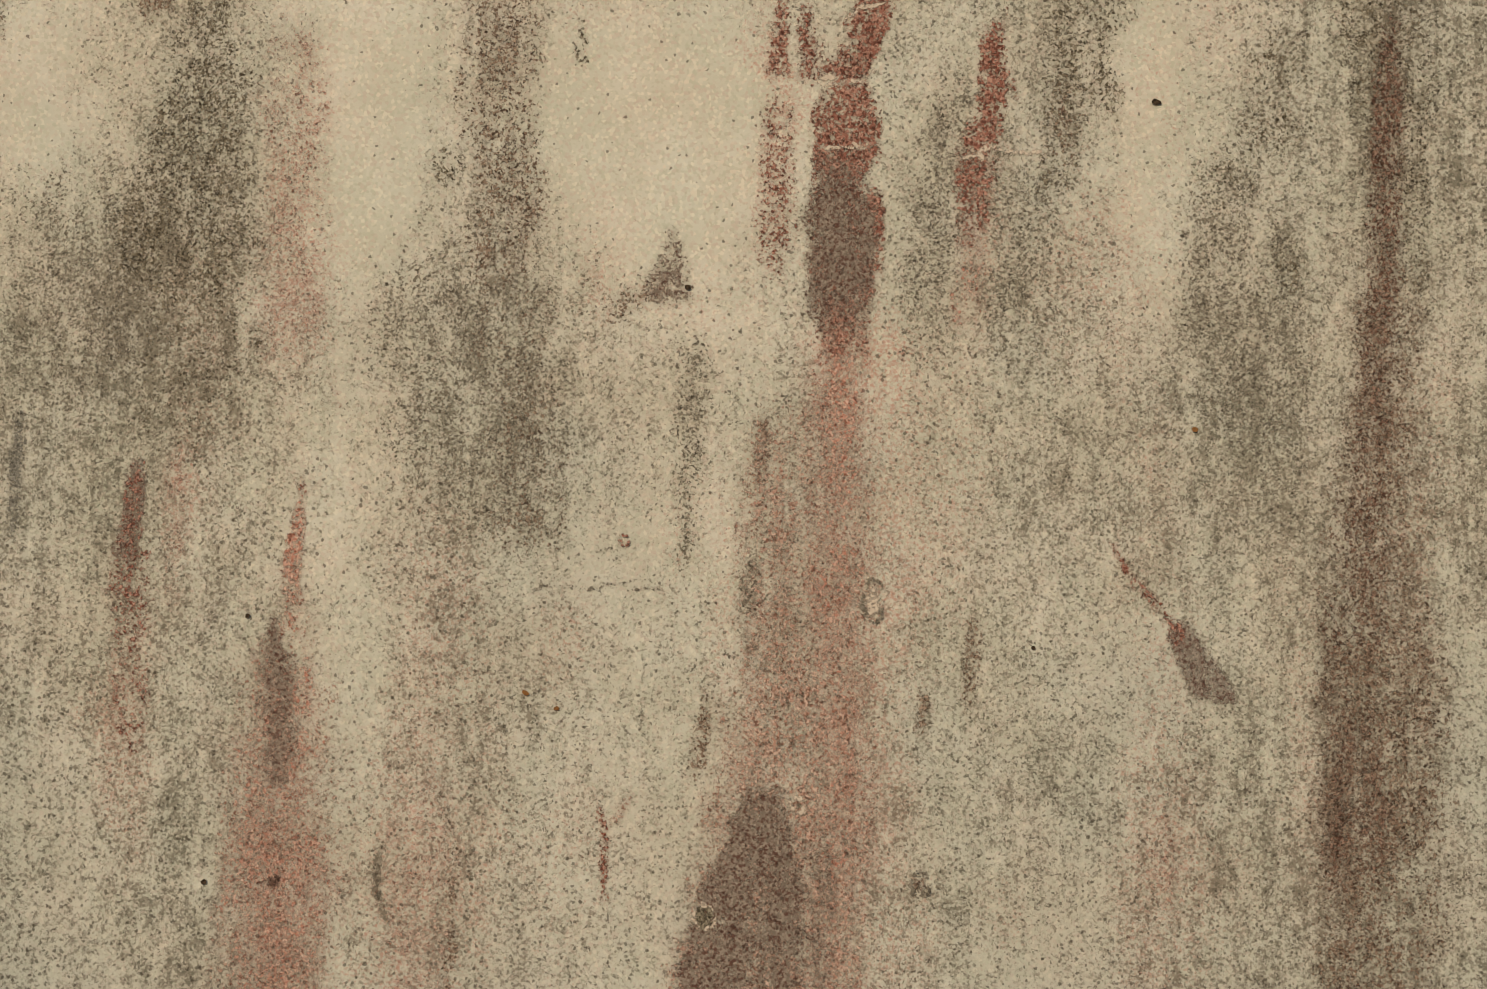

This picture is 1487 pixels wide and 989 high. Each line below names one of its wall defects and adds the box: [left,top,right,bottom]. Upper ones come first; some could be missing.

water stain [2,0,267,537]
water stain [366,0,582,568]
water stain [572,3,589,67]
water stain [602,226,694,327]
corrosion [949,7,1019,327]
corrosion [105,439,192,777]
corrosion [202,483,354,989]
corrosion [366,775,457,989]
corrosion [661,0,895,989]
corrosion [1109,542,1239,705]
corrosion [1305,15,1463,989]